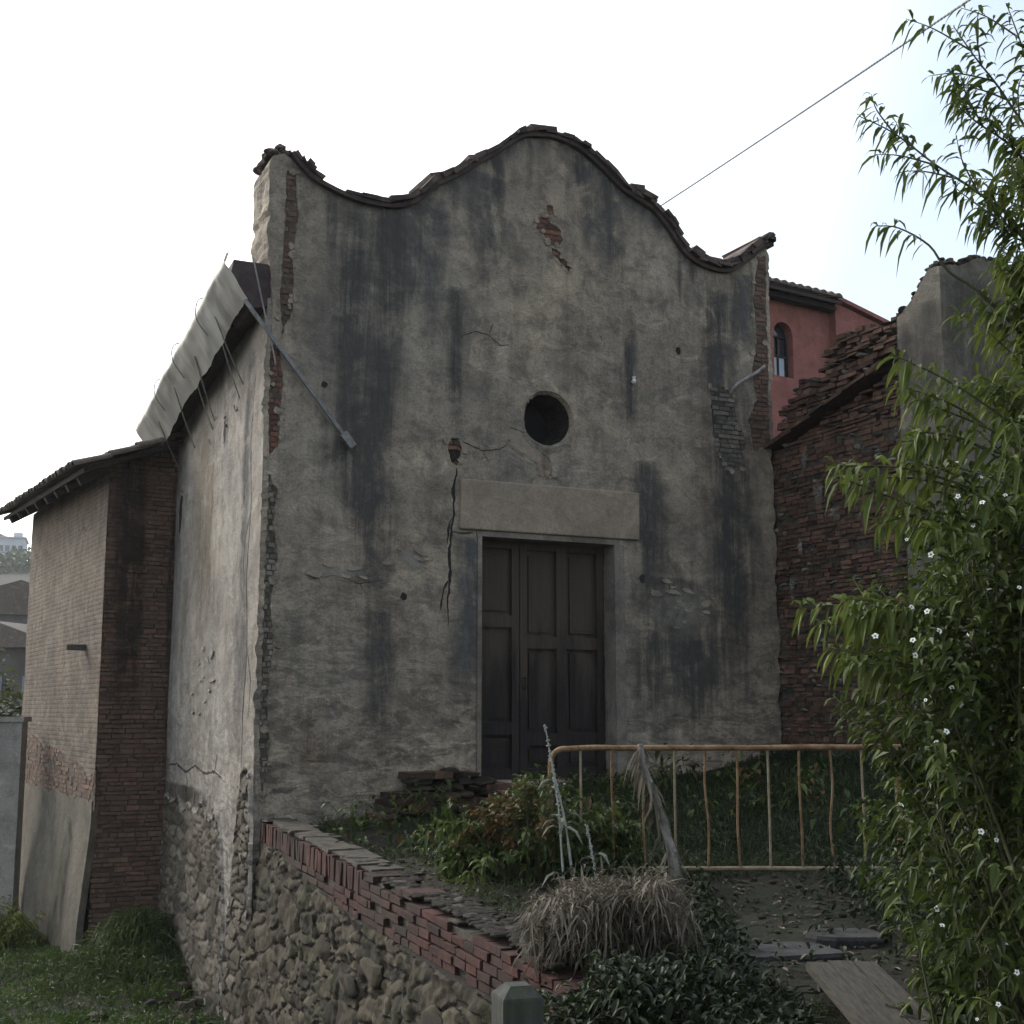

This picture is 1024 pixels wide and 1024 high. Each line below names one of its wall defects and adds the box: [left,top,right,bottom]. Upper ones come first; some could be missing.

flaking render [532,201,575,275]
crack [168,373,256,787]
flaking render [158,166,303,1024]
damp [327,193,444,584]
flaking render [443,435,468,469]
crack [439,468,473,627]
damp [634,463,718,710]
damp [707,274,753,637]
flaking render [707,253,774,478]
flaking render [25,731,97,812]